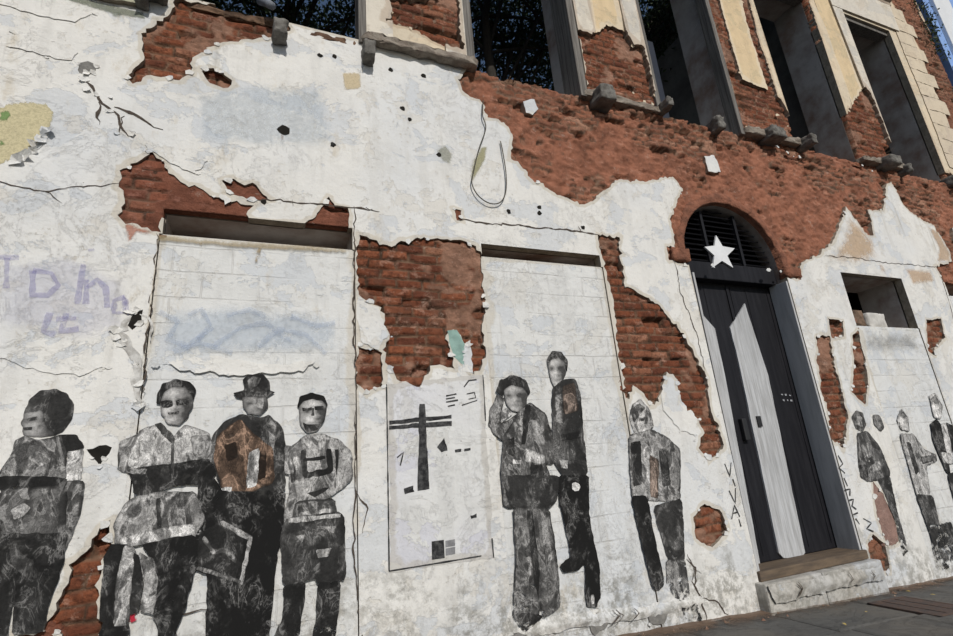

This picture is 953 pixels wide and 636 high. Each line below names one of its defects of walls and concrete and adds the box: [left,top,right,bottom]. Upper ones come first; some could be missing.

spalling [124,2,272,88]
spalling [390,0,463,49]
crack [78,69,163,136]
spalling [119,130,266,239]
spalling [305,198,349,232]
spalling [460,0,953,285]
spalling [354,237,490,394]
spalling [598,235,721,460]
spalling [816,320,869,448]
spalling [926,319,945,355]
spalling [15,520,113,636]
spalling [693,505,730,546]